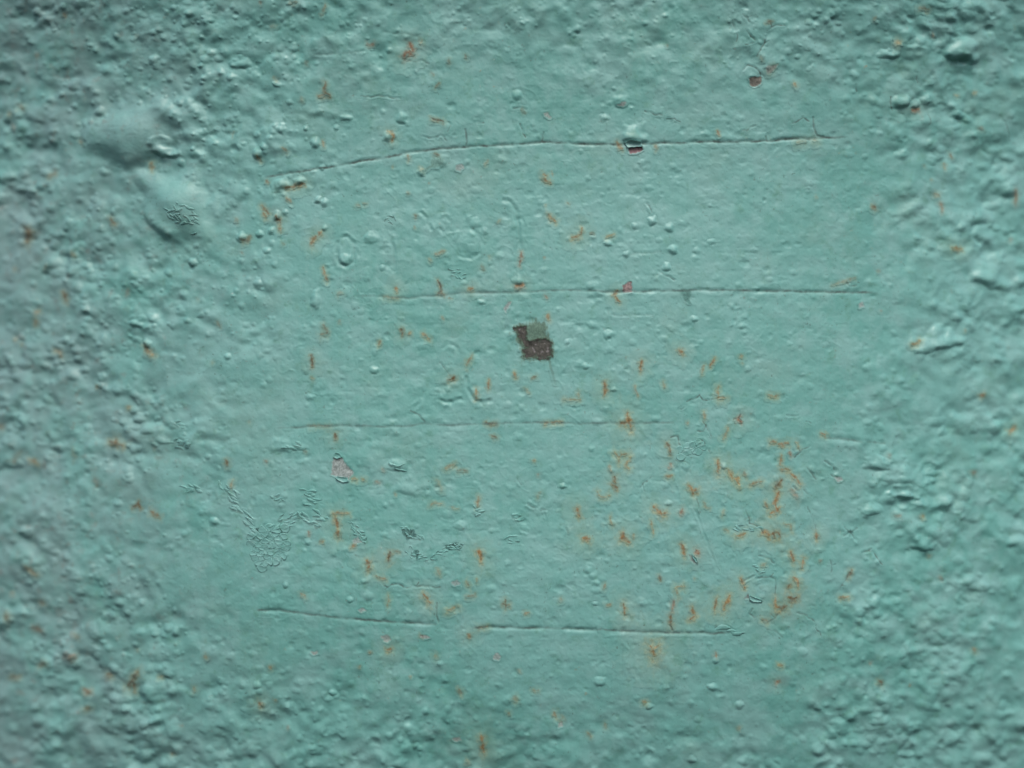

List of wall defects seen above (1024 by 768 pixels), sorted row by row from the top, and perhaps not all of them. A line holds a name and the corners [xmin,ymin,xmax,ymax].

crack [253,107,858,185]
peeling [624,140,645,155]
crack [334,234,888,305]
peeling [502,300,558,387]
peeling [330,453,355,482]
corrosion [698,351,824,629]
crack [247,579,622,638]